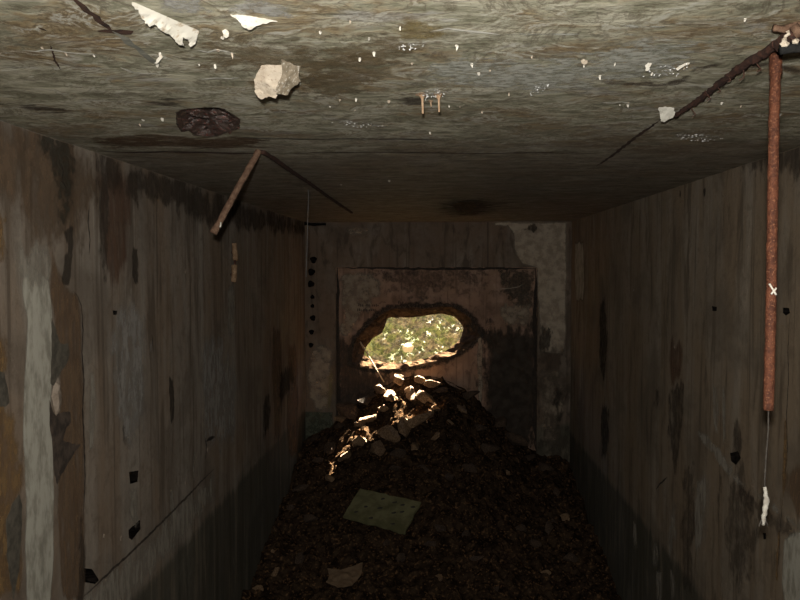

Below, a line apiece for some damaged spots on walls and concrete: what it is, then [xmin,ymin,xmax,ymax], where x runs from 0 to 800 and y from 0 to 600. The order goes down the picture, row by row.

crack [24,27,87,69]
crack [74,0,161,74]
peeling [132,2,199,47]
peeling [231,0,290,30]
peeling [254,59,301,99]
spalling [175,107,240,137]
crack [102,138,502,154]
crack [594,120,660,167]
hole [349,302,484,374]